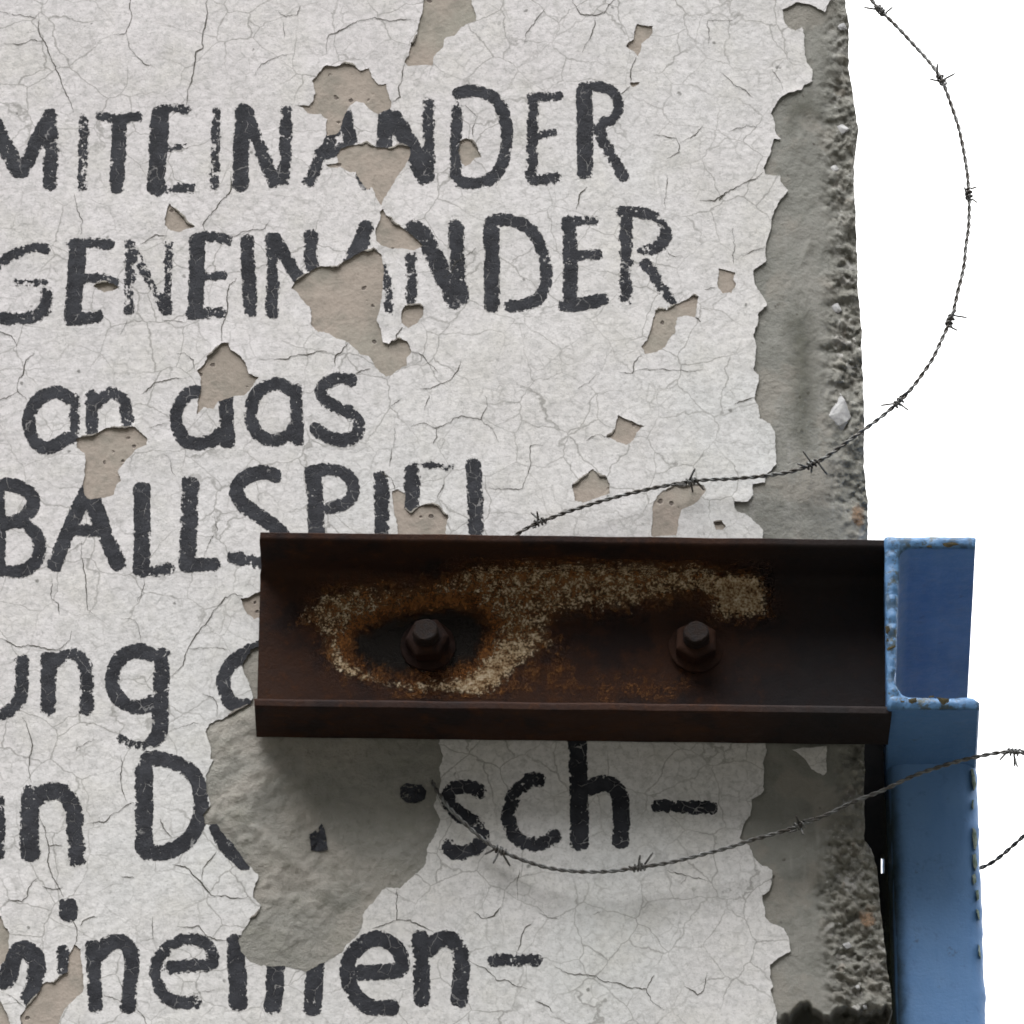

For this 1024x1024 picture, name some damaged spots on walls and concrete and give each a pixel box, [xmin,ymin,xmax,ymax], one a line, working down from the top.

crack [4,12,74,112]
crack [186,5,208,105]
peeling [298,61,392,136]
peeling [405,0,476,66]
peeling [292,141,424,376]
spalling [734,0,868,540]
crack [381,327,497,489]
corrosion [297,557,767,697]
crack [10,816,95,944]
crack [172,854,248,899]
spalling [203,646,443,972]
spalling [740,743,893,1024]